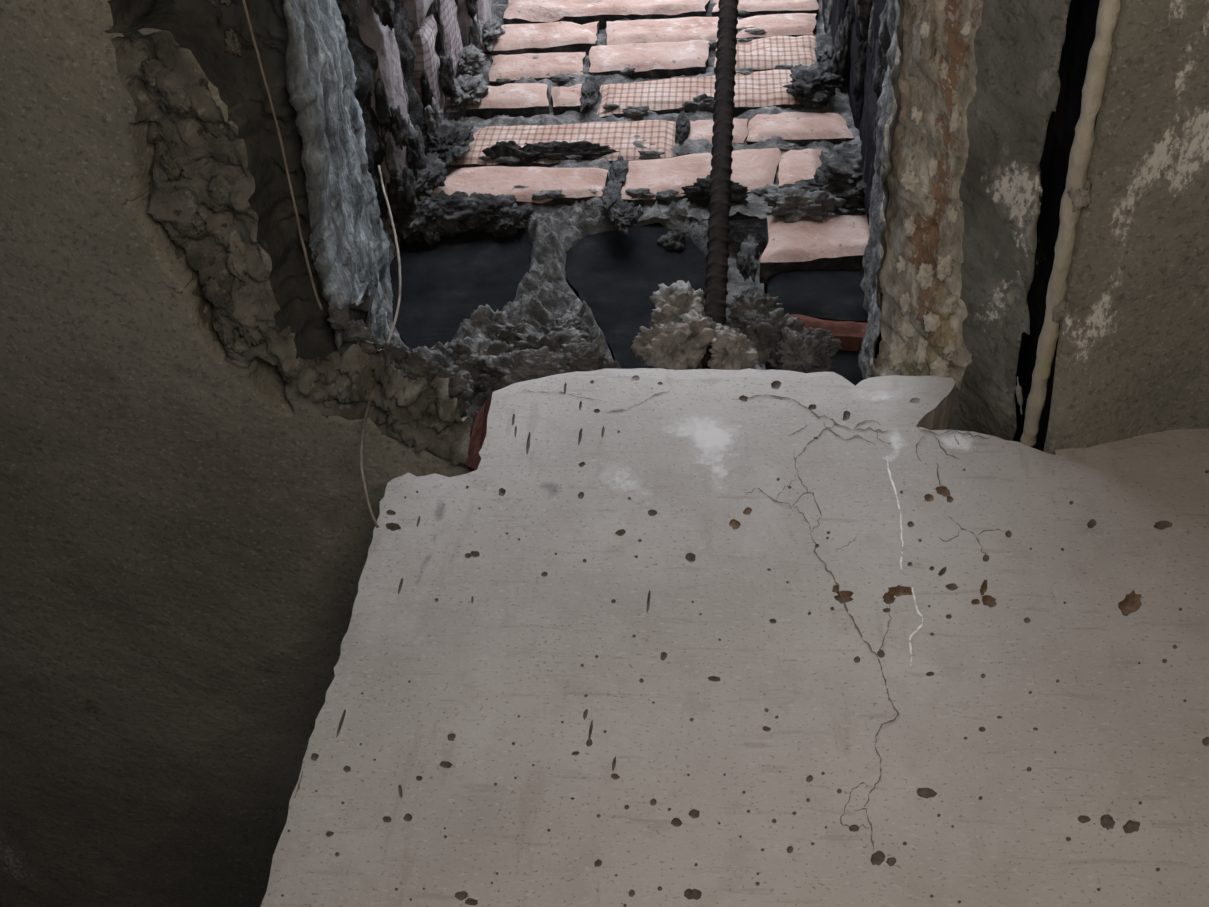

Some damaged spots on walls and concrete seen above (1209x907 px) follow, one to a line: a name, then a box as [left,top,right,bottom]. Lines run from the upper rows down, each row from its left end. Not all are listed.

flaking render [104,0,709,472]
peeling [726,0,984,389]
rust [908,0,981,347]
leakage [1063,270,1122,363]
leakage [1111,44,1209,246]
crack [742,395,990,851]
crack [940,516,999,561]